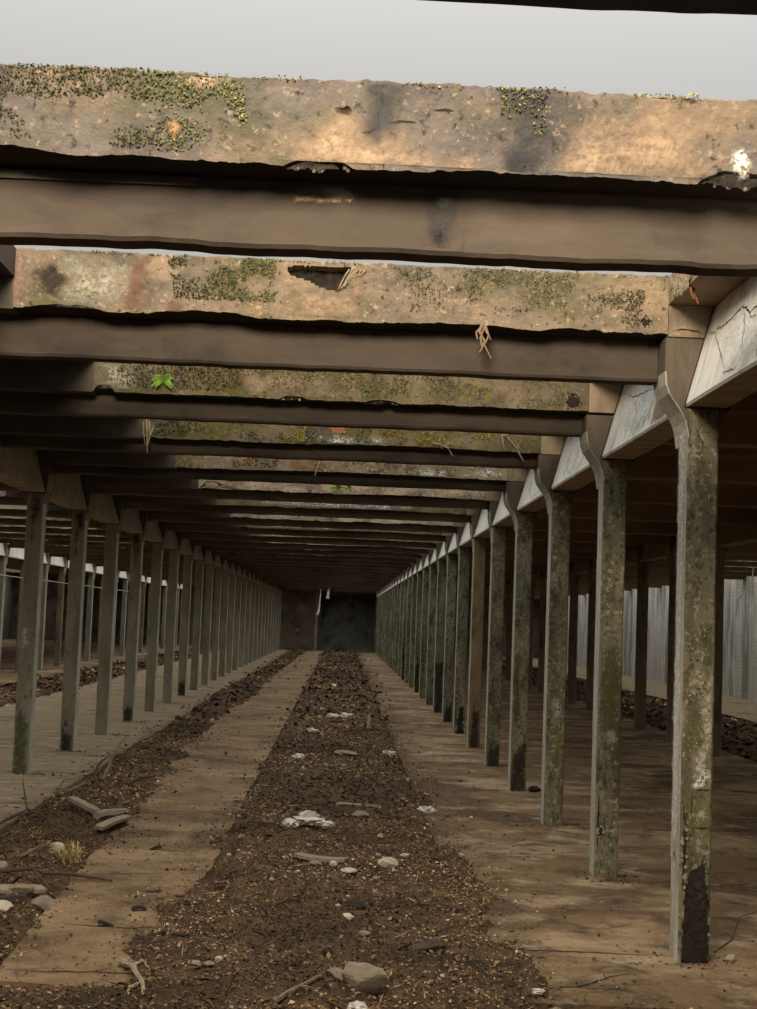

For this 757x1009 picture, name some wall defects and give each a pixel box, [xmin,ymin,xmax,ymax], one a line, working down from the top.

efflorescence [731,150,749,174]
spalling [697,174,757,192]
water stain [41,265,66,290]
peeling [290,269,366,317]
crack [675,305,757,373]